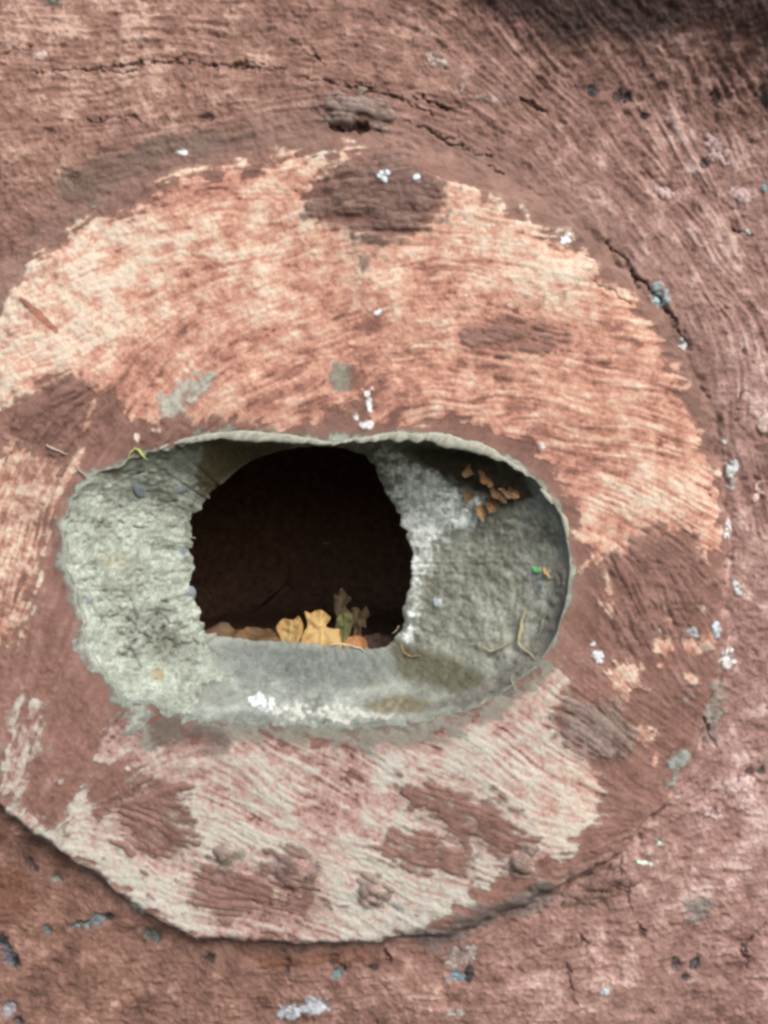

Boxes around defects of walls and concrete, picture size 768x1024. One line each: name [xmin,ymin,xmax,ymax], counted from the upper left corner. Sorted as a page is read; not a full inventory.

peeling [0,133,739,717]
peeling [730,184,767,204]